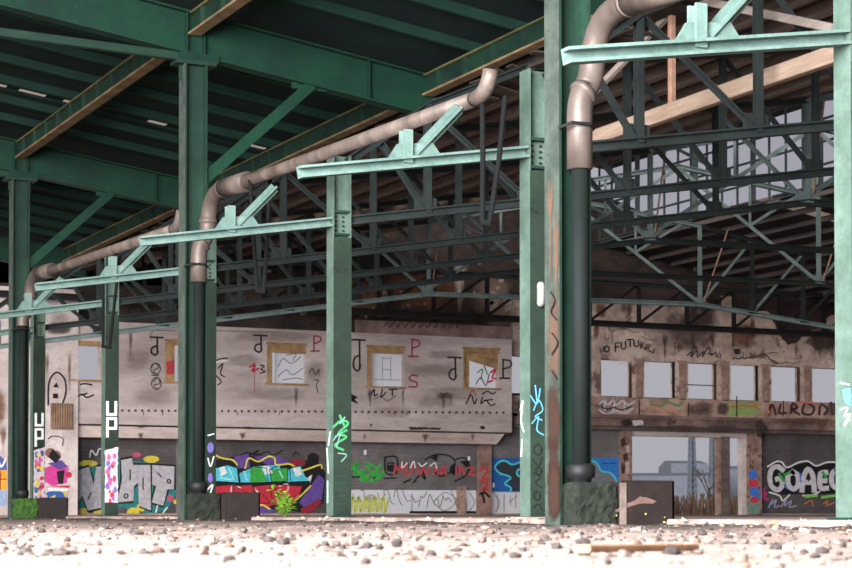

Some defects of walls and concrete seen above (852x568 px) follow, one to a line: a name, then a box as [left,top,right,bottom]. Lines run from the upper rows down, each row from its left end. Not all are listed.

corrosion [550,230,558,278]
leakage [622,278,683,316]
corrosion [548,300,559,374]
leakage [663,302,714,353]
leakage [813,328,835,356]
corrosion [548,387,560,517]